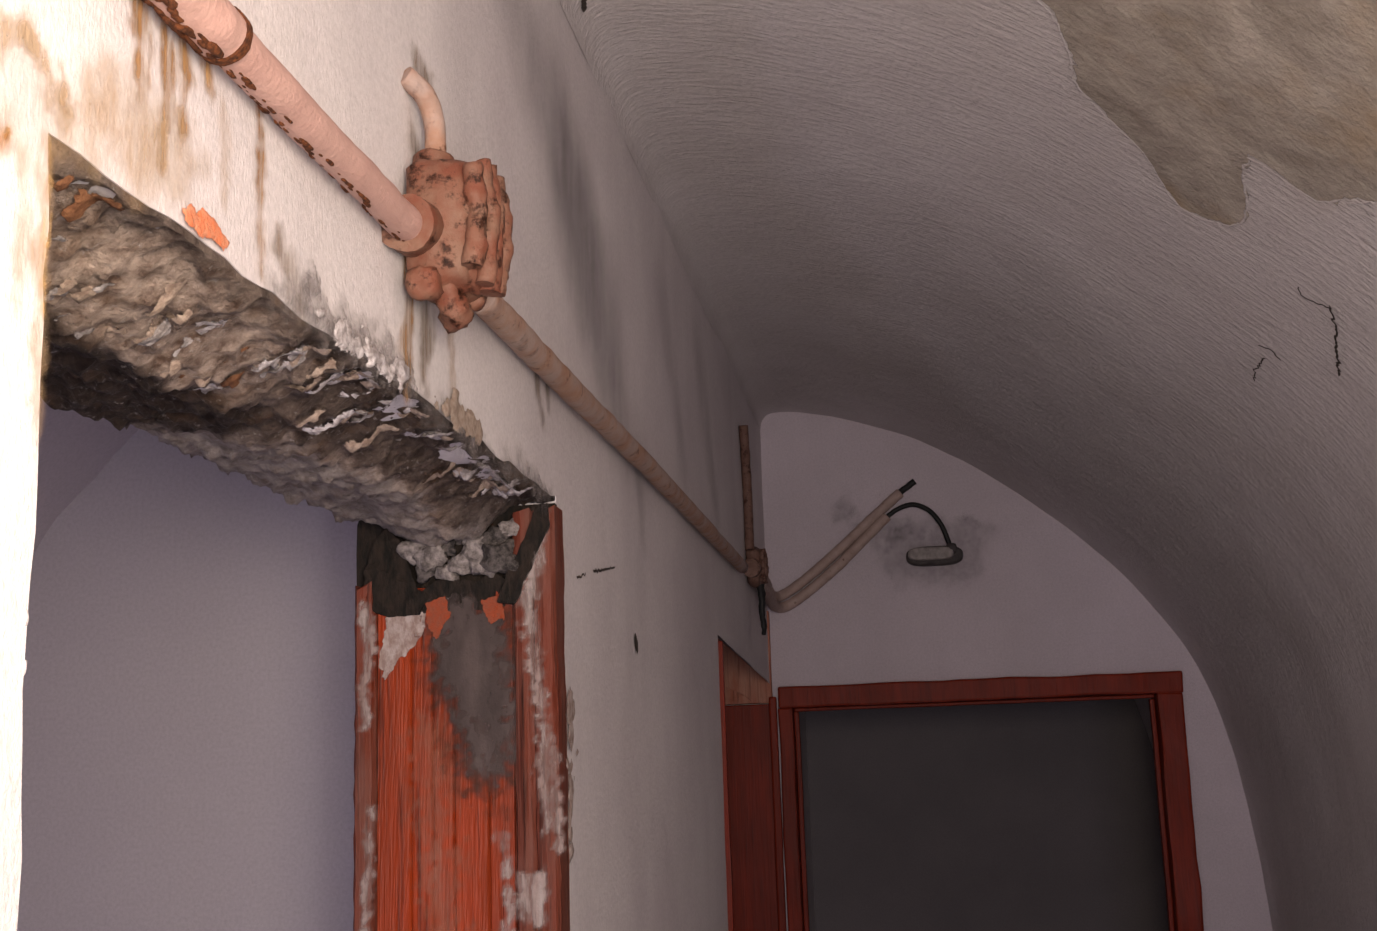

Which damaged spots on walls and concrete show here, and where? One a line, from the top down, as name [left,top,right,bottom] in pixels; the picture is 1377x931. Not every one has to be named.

flaking render [1036,0,1377,227]
spalling [47,175,125,242]
spalling [43,279,115,321]
spalling [74,271,546,499]
spalling [378,518,519,680]